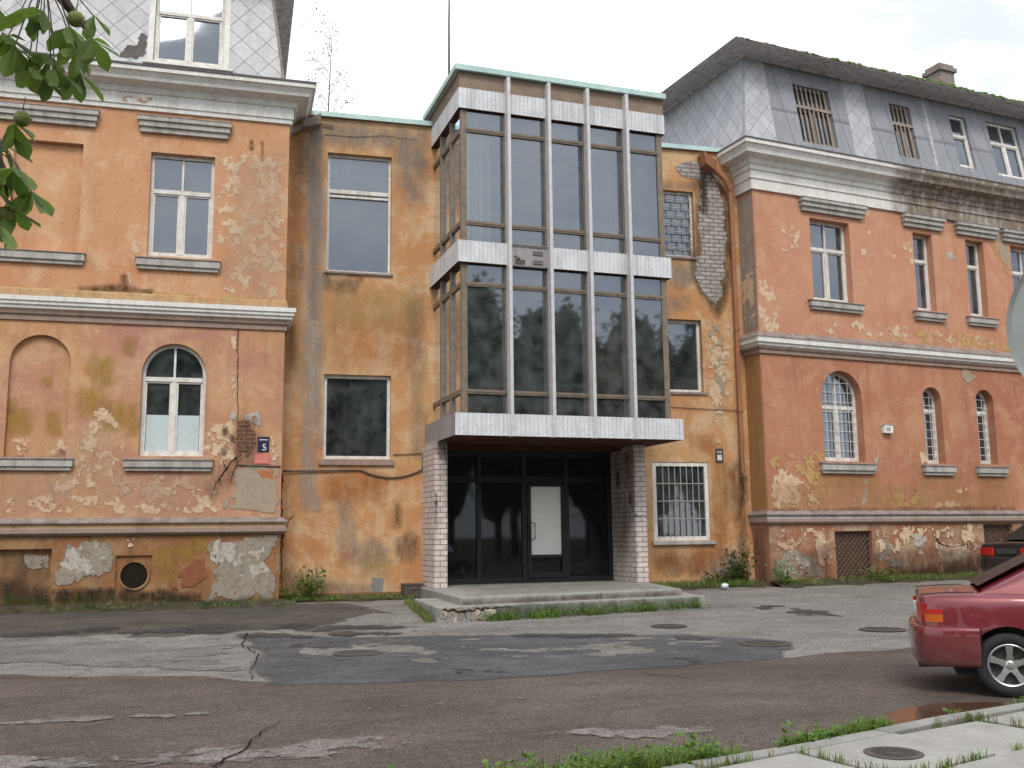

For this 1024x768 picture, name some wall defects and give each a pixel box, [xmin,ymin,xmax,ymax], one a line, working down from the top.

peeling [213,151,285,299]
flaking render [676,161,728,304]
flaking render [5,408,279,515]
crack [211,330,239,496]
peeling [707,320,731,443]
peeling [769,451,829,509]
peeling [851,321,1010,351]
peeling [24,554,49,569]
peeling [777,528,834,566]
peeling [873,523,980,568]